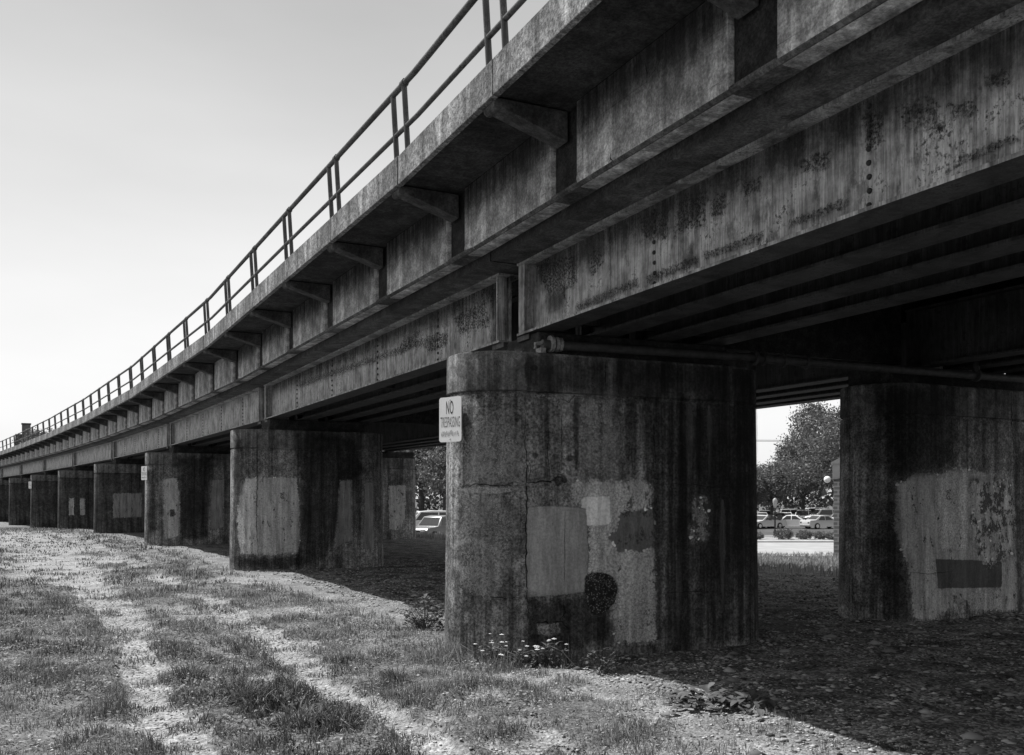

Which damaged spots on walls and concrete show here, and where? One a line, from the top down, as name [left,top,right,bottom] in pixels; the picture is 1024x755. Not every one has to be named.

leakage [537,20,1024,277]
crack [464,399,568,644]
leakage [653,361,759,643]
leakage [880,387,959,476]
peeling [937,467,1016,570]